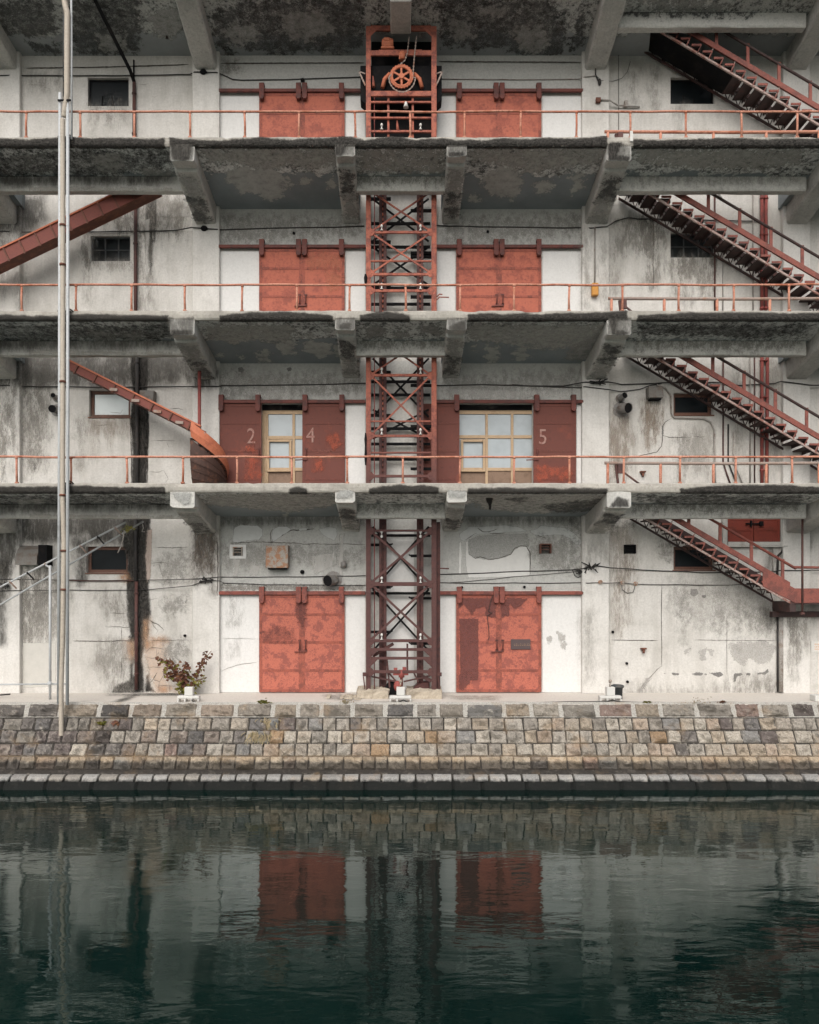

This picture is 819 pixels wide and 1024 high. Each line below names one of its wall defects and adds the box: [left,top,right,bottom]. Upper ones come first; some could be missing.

leakage [0,136,819,175]
leakage [0,176,410,702]
crack [217,529,366,591]
peeling [444,498,625,578]
rust [145,626,166,690]
peeling [684,641,776,682]